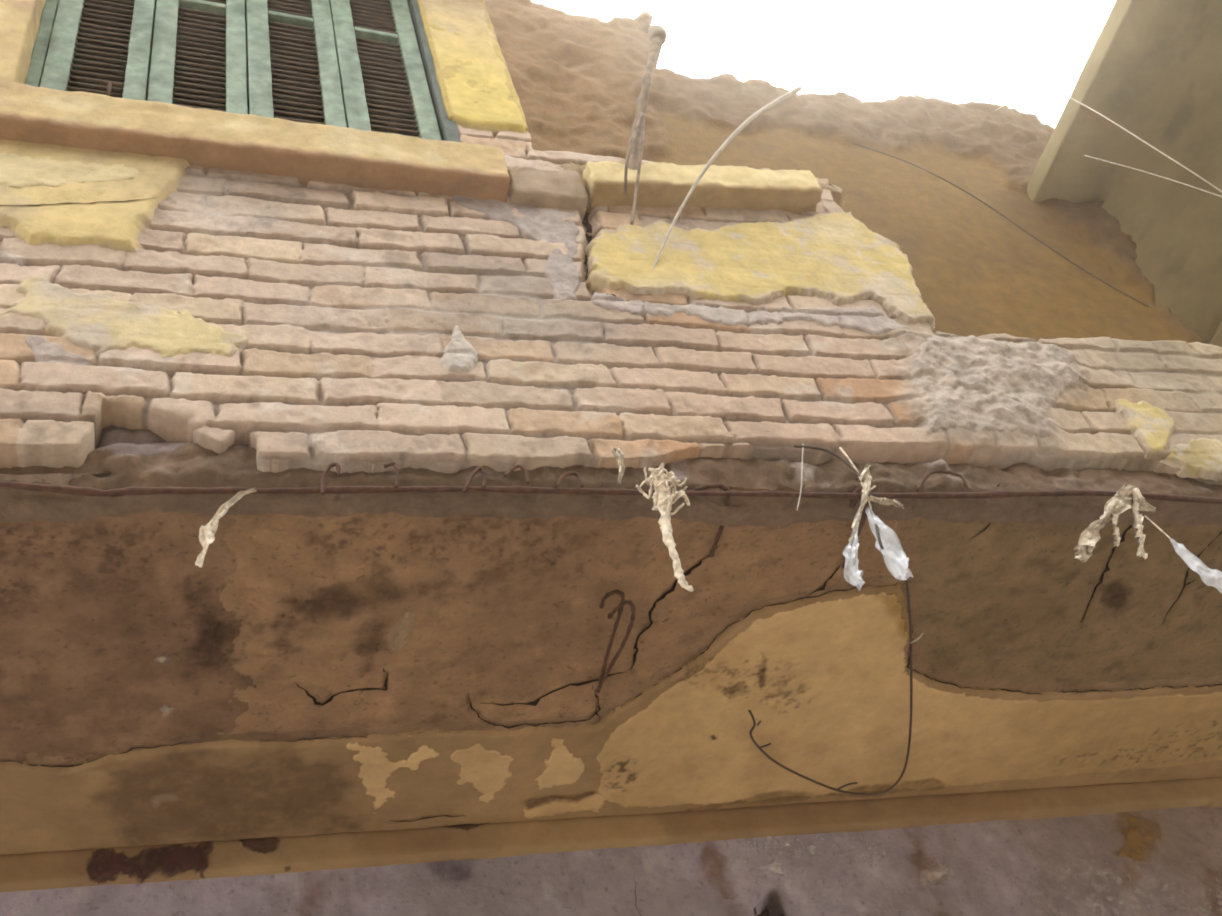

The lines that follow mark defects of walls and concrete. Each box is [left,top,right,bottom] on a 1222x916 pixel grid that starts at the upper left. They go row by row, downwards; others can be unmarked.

flaking render [584,178,935,329]
flaking render [0,277,249,359]
spalling [0,462,655,497]
spalling [671,470,1117,537]
flaking render [1114,399,1222,481]
crack [1081,525,1132,623]
crack [1163,531,1222,623]
crack [248,545,899,742]
crack [907,617,1222,695]
peeling [523,589,1222,818]
crack [5,741,206,767]
peeling [346,742,513,814]